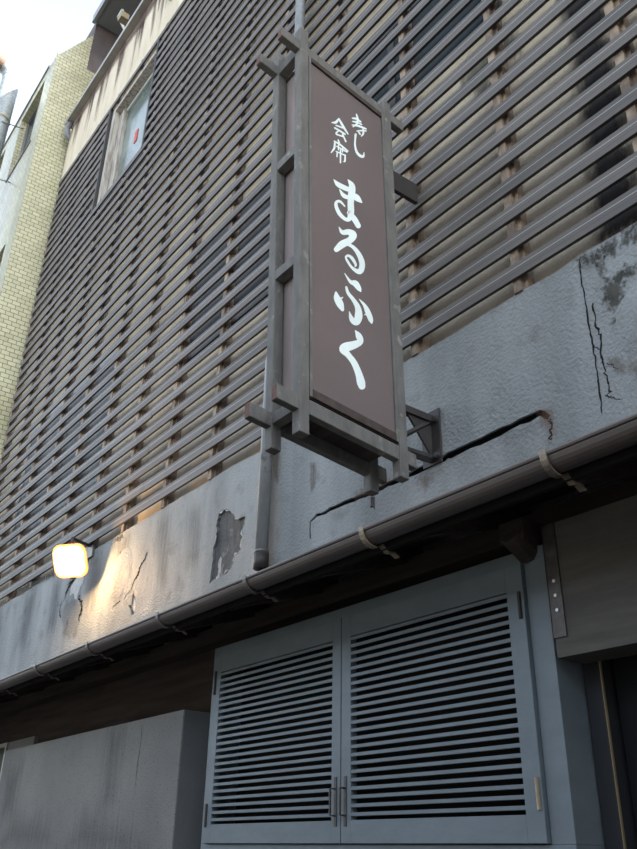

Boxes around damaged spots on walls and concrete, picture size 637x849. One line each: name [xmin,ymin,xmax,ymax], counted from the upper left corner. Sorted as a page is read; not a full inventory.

water stain [571,8,605,41]
water stain [575,37,606,67]
water stain [576,60,612,92]
water stain [583,83,620,120]
water stain [586,111,626,150]
water stain [591,146,626,181]
water stain [595,176,633,210]
water stain [577,206,637,310]
crack [579,259,623,414]
crack [316,411,553,517]
flaking render [209,509,245,583]
peeling [65,576,84,624]